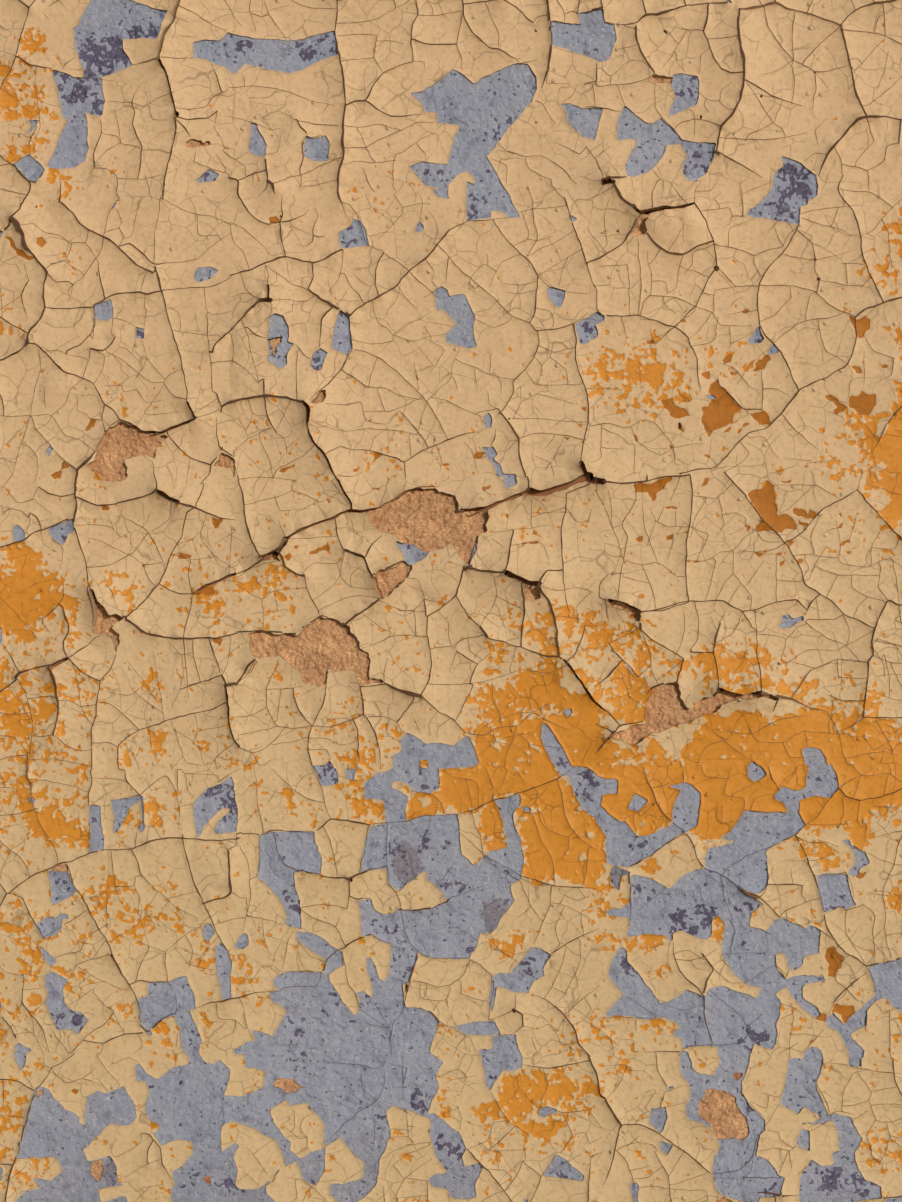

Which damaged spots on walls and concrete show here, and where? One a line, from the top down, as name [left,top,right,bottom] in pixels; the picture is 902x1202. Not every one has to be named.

crack [0,0,75,153]
peeling [193,31,338,74]
peeling [408,52,537,227]
crack [504,0,568,88]
crack [557,0,603,22]
crack [585,0,902,194]
peeling [435,287,489,358]
spalling [547,272,779,460]
peeling [721,287,902,583]
peeling [0,376,902,1202]
crack [0,584,799,1202]
crack [811,1052,902,1170]